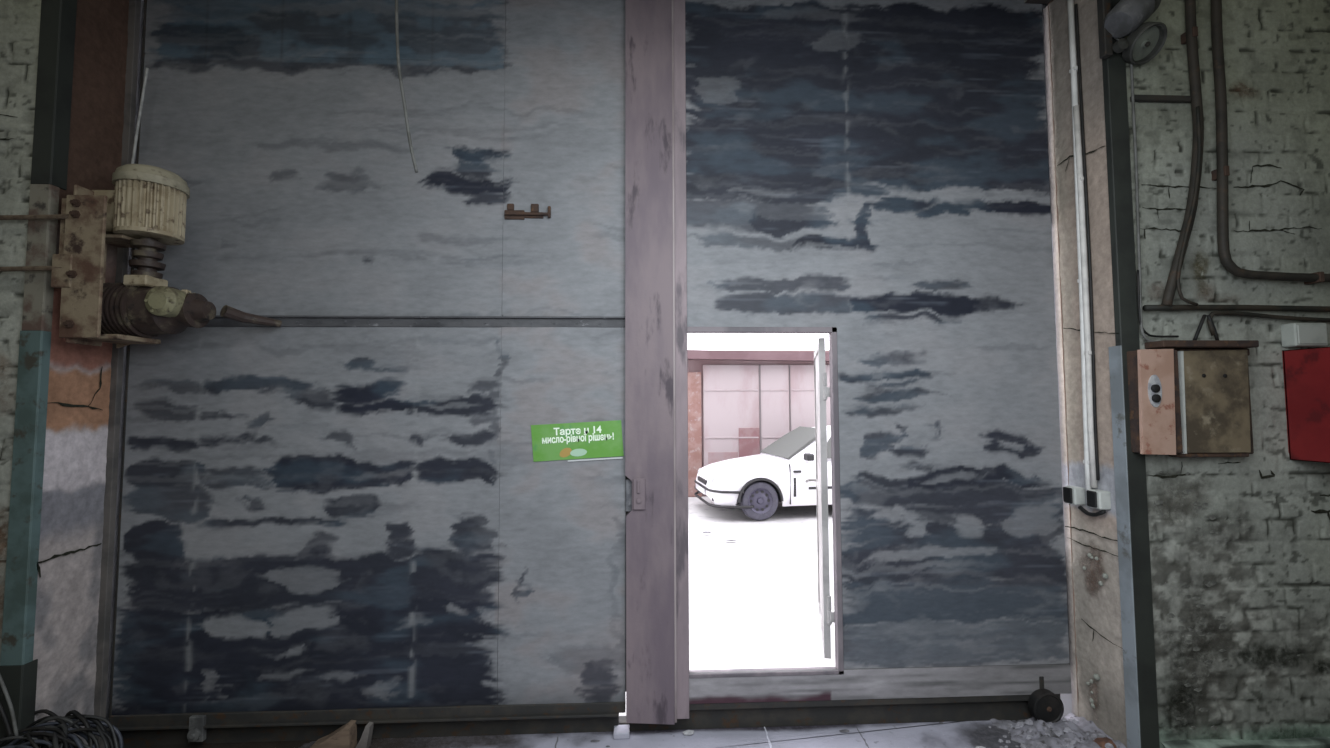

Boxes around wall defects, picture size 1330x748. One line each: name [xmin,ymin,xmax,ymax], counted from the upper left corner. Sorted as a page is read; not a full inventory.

water stain [1237,646,1299,665]